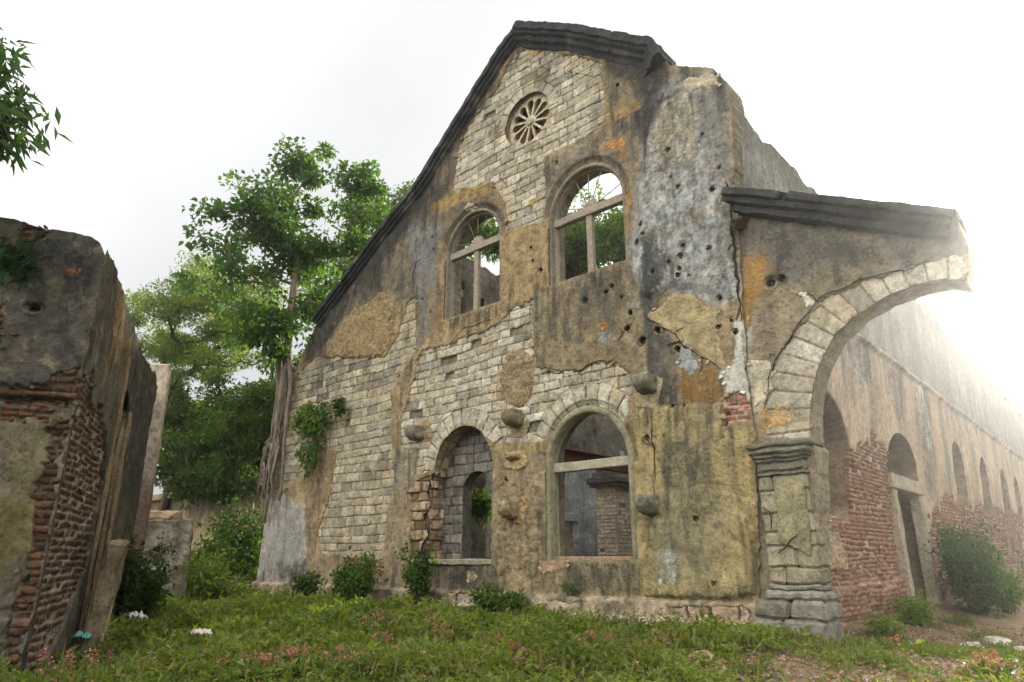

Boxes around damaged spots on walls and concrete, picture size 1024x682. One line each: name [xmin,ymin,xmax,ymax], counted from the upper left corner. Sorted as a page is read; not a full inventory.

spalling [453,48,605,232]
crack [550,319,721,380]
leakage [640,231,666,313]
crack [725,181,743,322]
crack [763,256,934,409]
spalling [0,369,106,672]
spalling [274,298,632,576]
spalling [448,571,478,608]
leakage [657,551,677,597]
leakage [661,434,712,537]
leakage [686,585,751,601]
spalling [829,429,907,626]